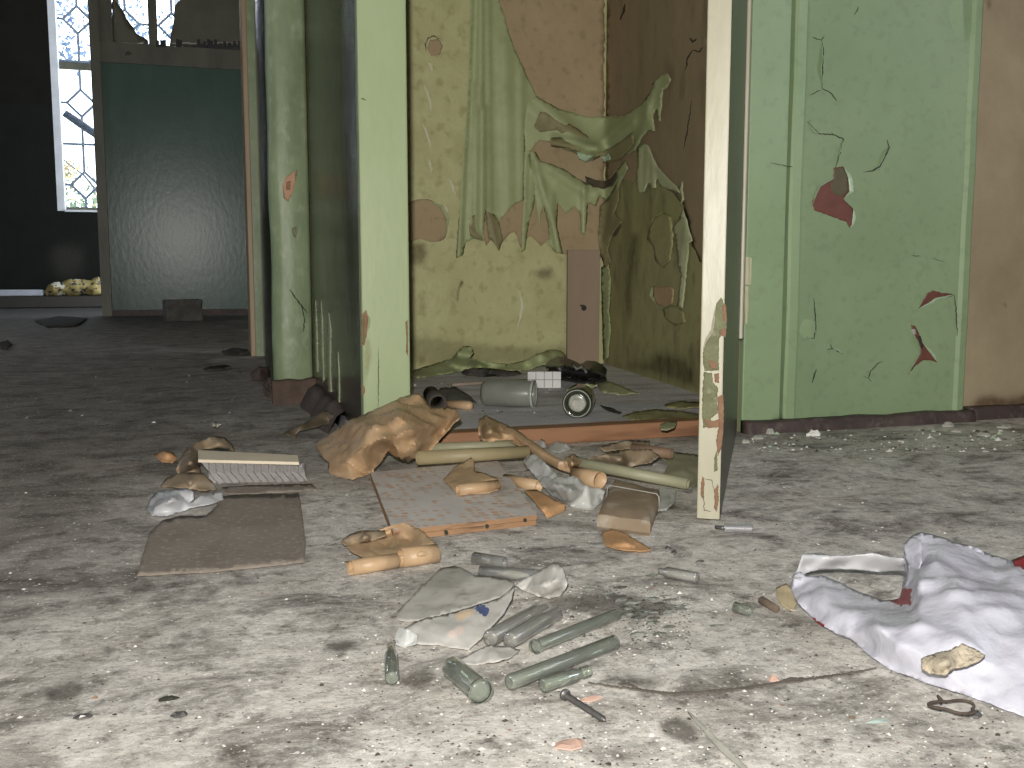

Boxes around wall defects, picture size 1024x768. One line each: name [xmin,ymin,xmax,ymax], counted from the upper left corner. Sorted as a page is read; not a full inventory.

crack [685,38,703,70]
crack [811,37,837,101]
crack [808,121,844,167]
crack [866,140,890,172]
peeling [282,170,297,201]
peeling [408,0,708,360]
peeling [812,166,856,228]
crack [289,289,307,330]
peeling [918,290,952,309]
peeling [908,325,937,374]
peeling [623,298,727,512]